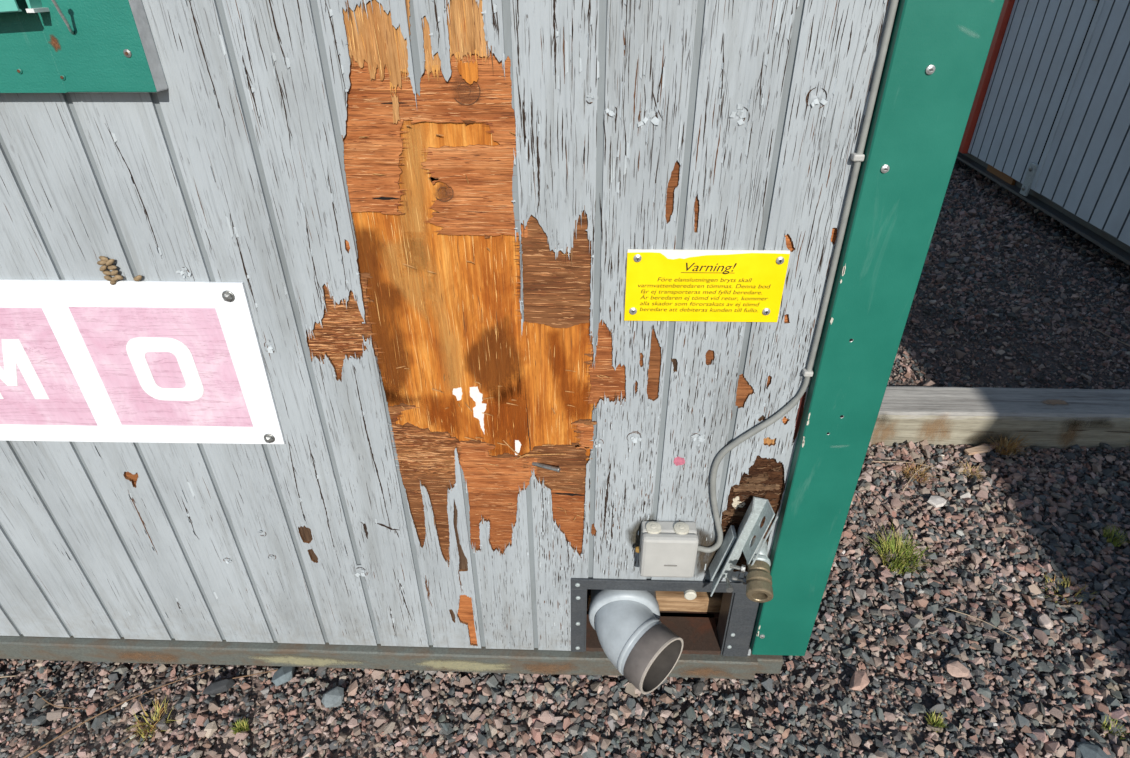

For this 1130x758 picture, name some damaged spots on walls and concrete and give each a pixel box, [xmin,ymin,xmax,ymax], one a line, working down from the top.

peeling [665,160,680,222]
peeling [635,326,677,399]
peeling [452,386,487,434]
peeling [735,374,771,407]
peeling [732,474,780,509]
peeling [300,525,318,561]
peeling [454,500,468,570]
peeling [450,595,477,644]